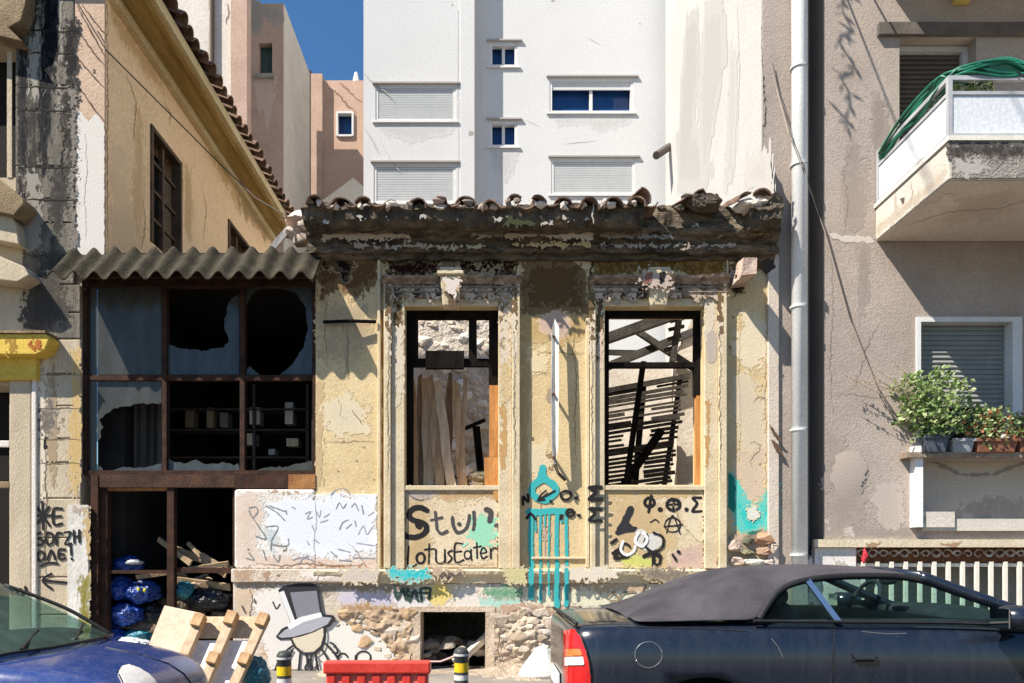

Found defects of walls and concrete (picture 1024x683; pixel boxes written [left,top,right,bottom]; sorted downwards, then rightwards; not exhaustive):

spalling [953,154,991,180]
peeling [321,214,737,410]
peeling [315,388,372,448]
peeling [587,261,784,505]
peeling [72,506,91,577]
spalling [321,599,422,660]